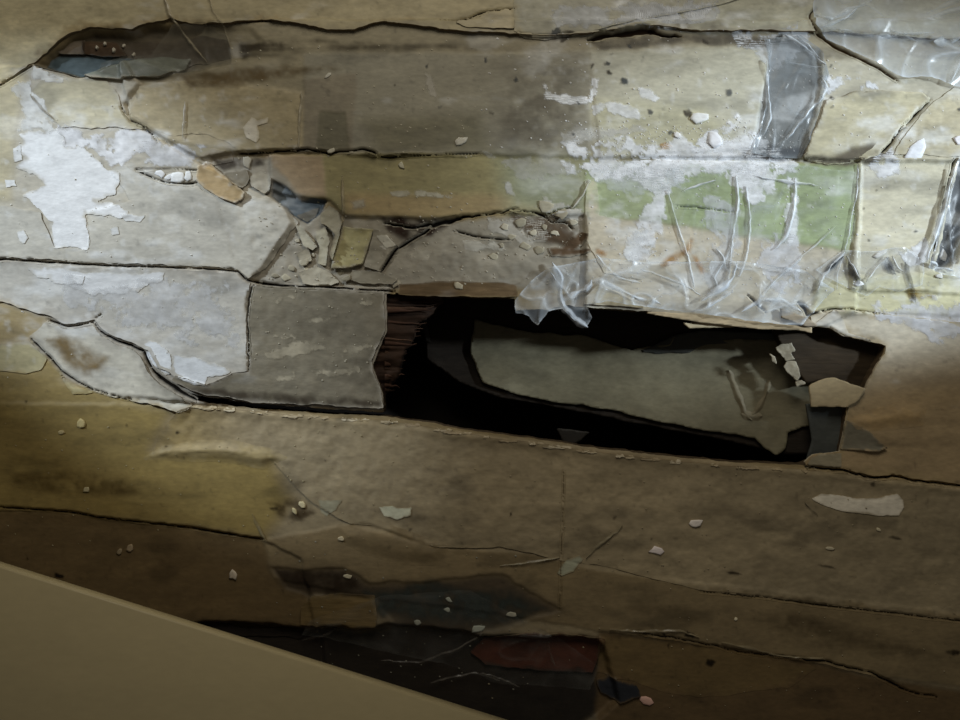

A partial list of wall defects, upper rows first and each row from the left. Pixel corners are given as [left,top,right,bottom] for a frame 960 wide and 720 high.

flaking render [47,36,231,80]
crack [587,23,682,43]
leakage [552,0,719,48]
leakage [694,26,812,69]
crack [808,6,899,83]
leakage [820,76,851,98]
crack [880,100,932,155]
peeling [5,127,145,250]
leakage [562,88,900,293]
crack [0,204,580,370]
spalling [144,323,807,462]
peeling [812,494,904,516]